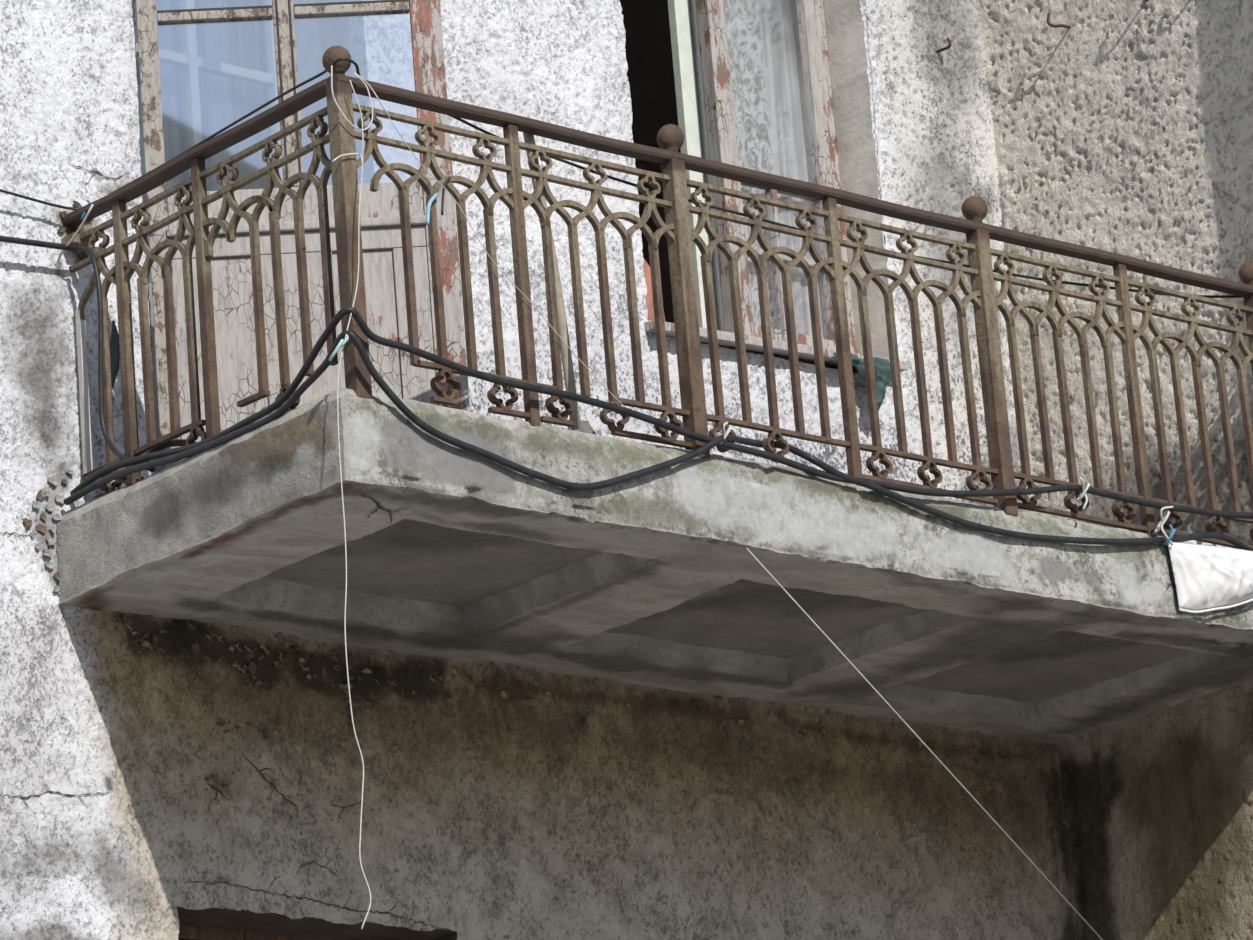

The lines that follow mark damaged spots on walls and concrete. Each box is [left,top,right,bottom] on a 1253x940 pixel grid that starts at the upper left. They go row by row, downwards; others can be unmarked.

flaking render [23,463,74,595]
leakage [682,468,902,558]
leakage [912,525,1006,576]
crack [0,783,109,808]
crack [242,754,297,807]
leakage [1049,754,1120,940]